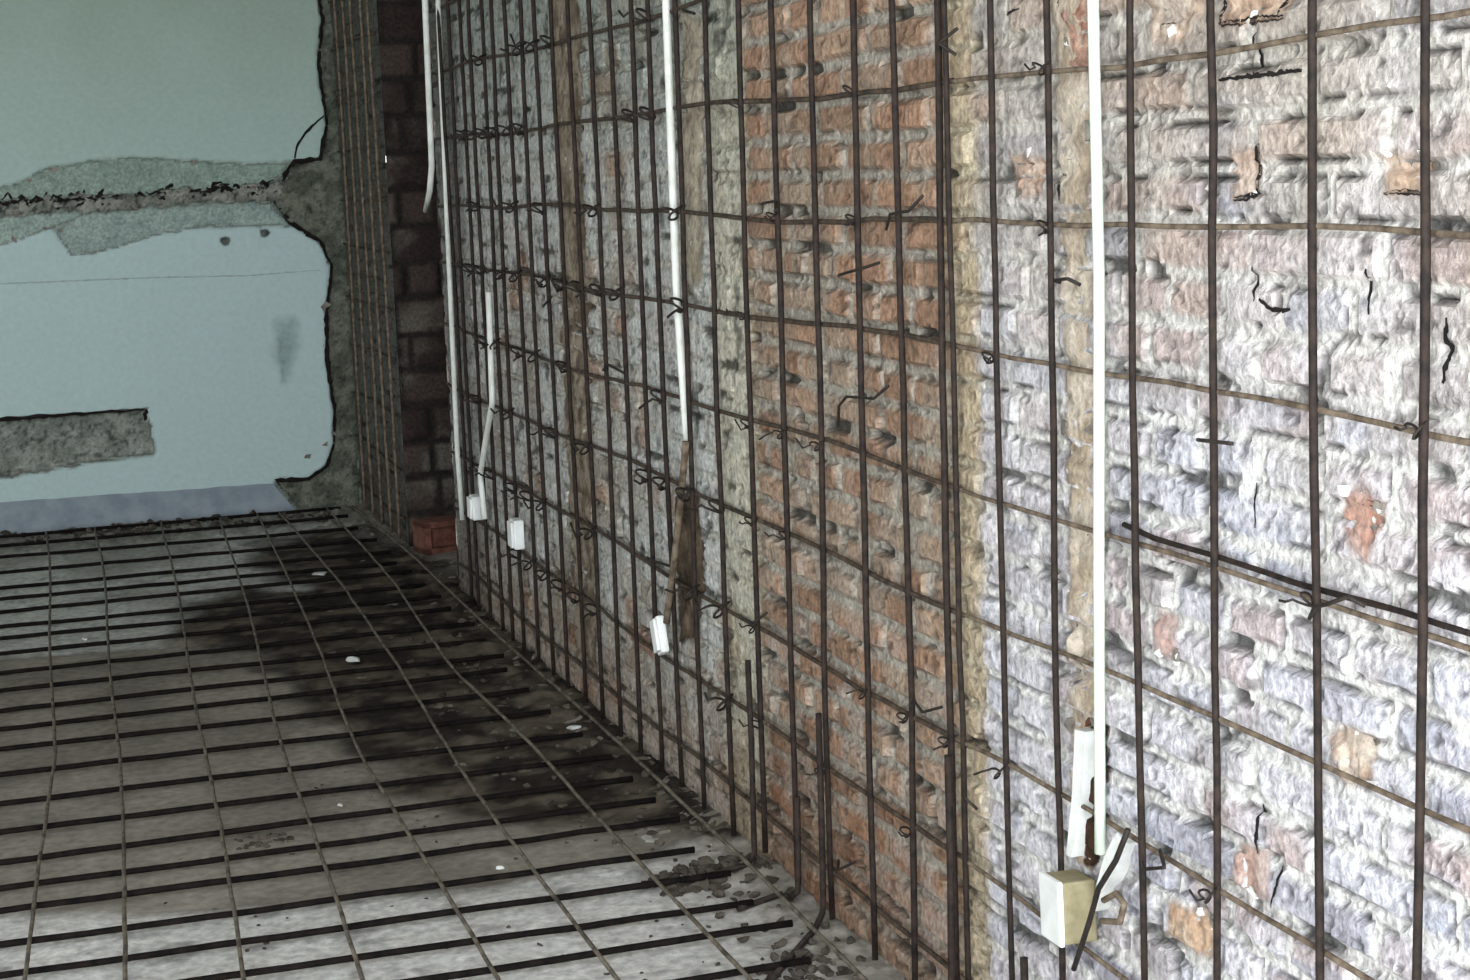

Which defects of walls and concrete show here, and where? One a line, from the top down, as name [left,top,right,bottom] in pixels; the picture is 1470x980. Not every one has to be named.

spalling [0,0,1094,980]
spalling [1059,0,1470,980]